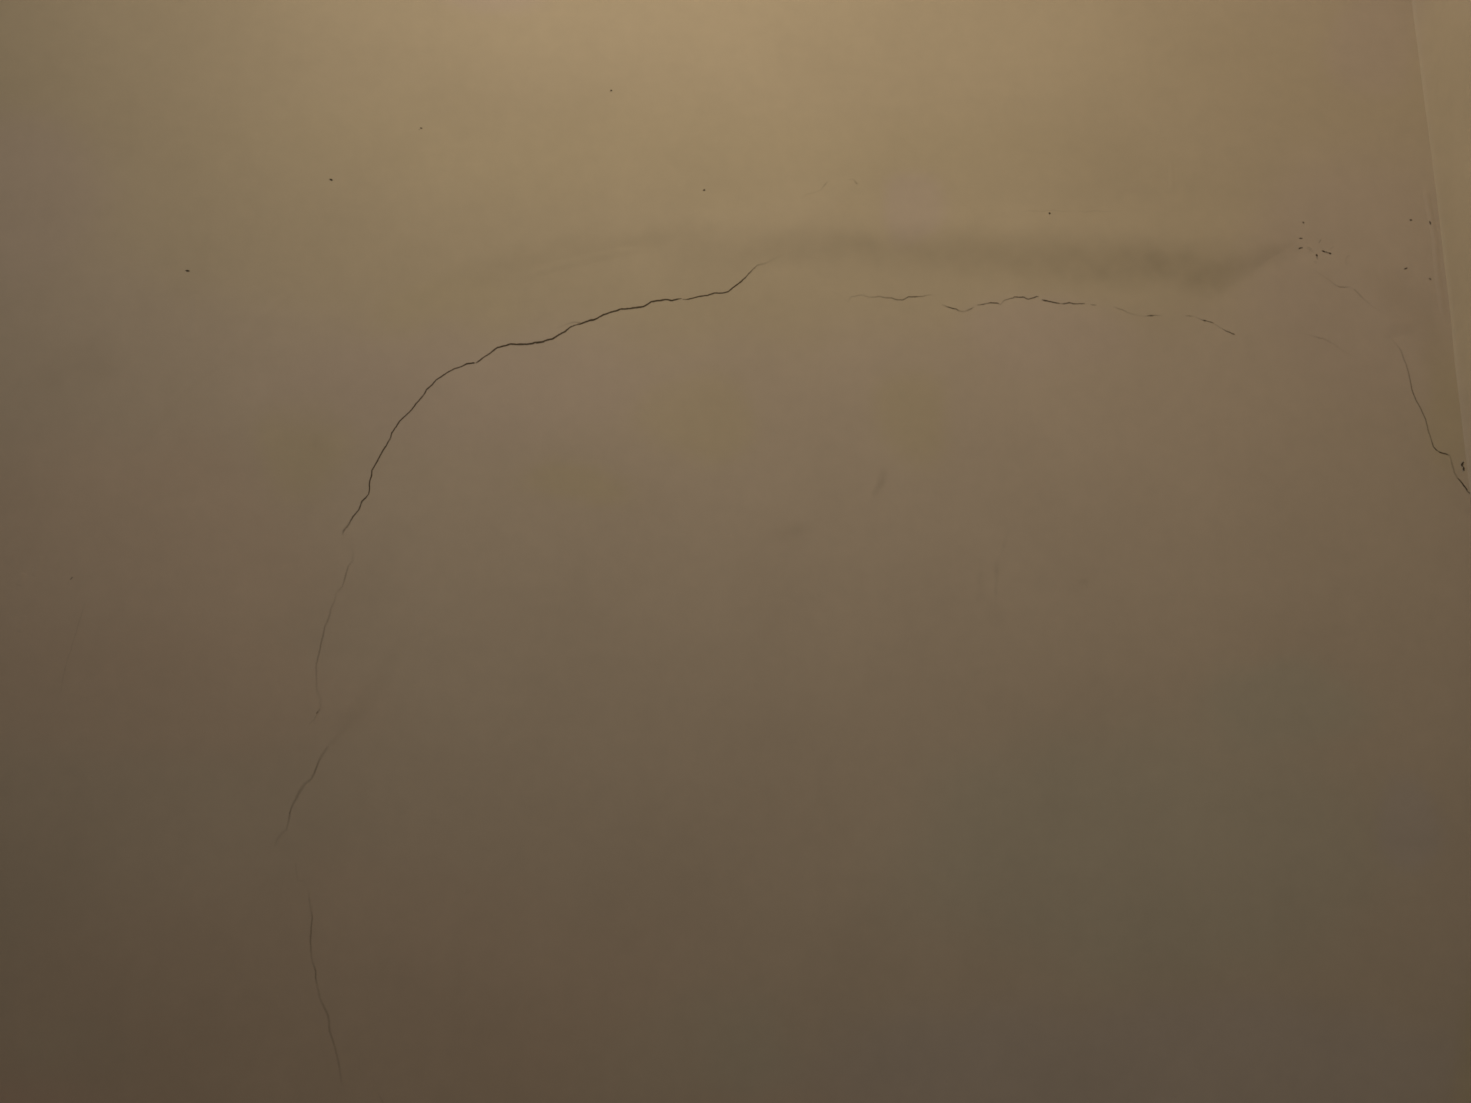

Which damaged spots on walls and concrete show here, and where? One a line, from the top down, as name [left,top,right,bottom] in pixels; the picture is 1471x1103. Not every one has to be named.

crack [352,276,747,518]